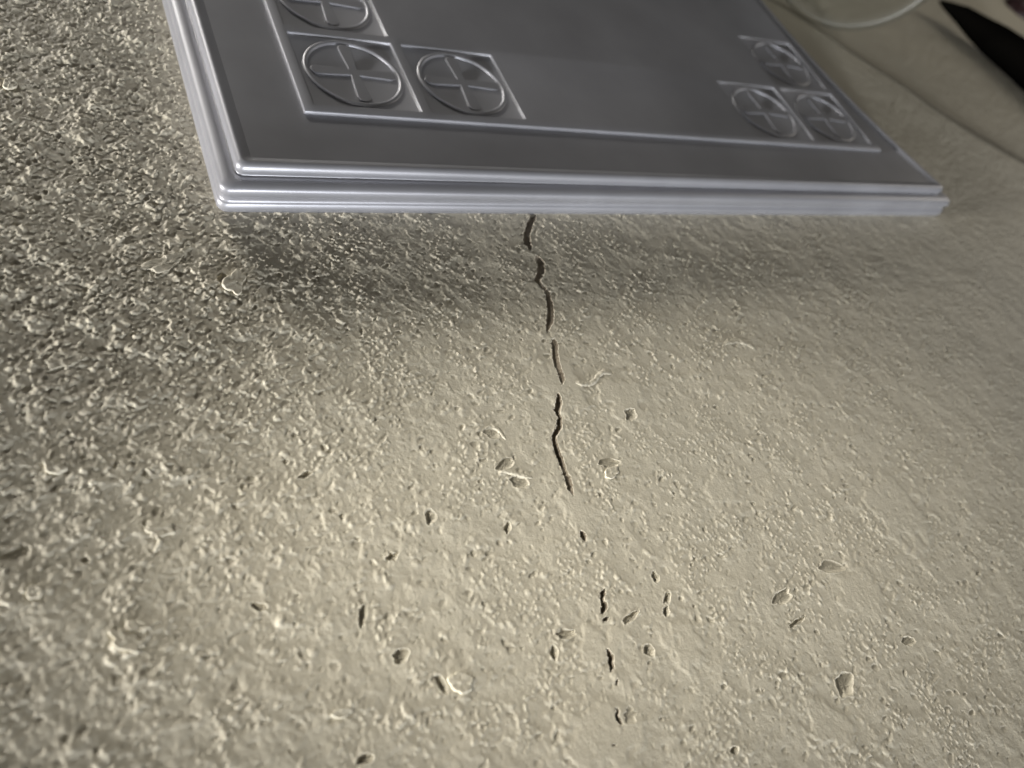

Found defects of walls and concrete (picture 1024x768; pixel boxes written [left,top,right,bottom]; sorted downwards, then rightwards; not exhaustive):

crack [522,214,575,496]
crack [579,530,588,542]
crack [598,589,610,623]
crack [605,648,624,748]